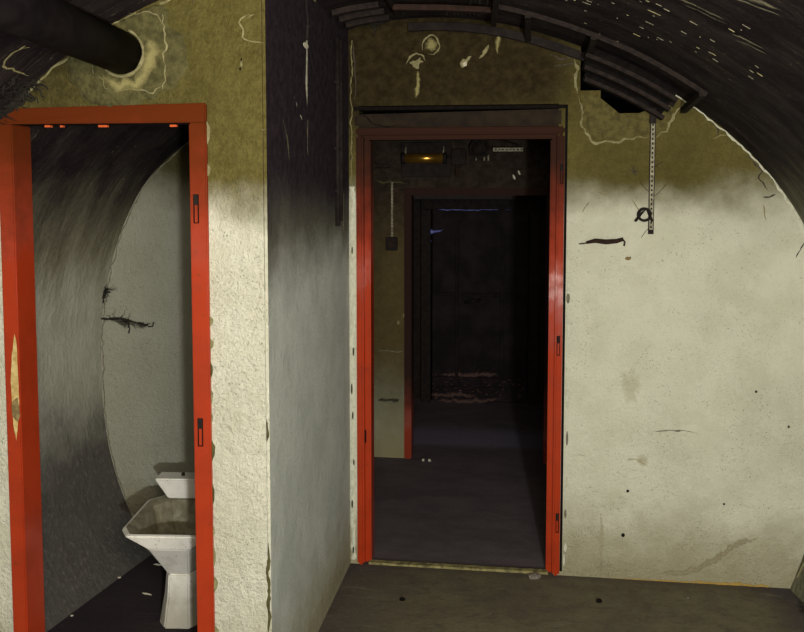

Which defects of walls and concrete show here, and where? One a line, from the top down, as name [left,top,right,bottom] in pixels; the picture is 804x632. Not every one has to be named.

peeling [406,34,440,96]
peeling [460,45,489,68]
peeling [11,334,20,438]